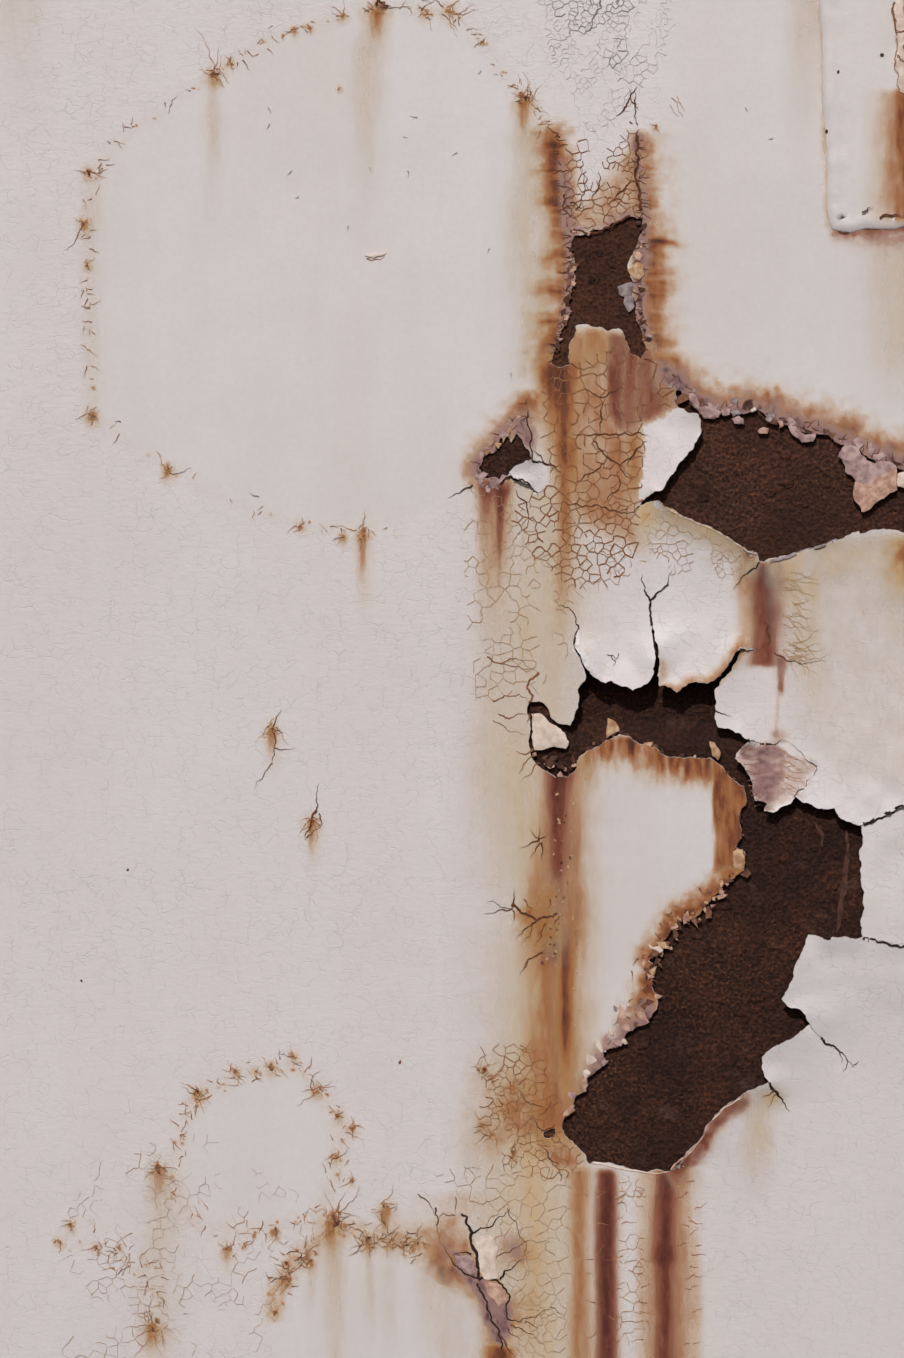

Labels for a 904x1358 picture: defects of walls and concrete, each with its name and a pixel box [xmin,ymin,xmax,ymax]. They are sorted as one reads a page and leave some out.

rust [364,0,477,36]
crack [79,21,313,442]
peeling [547,129,655,370]
rust [332,511,369,567]
peeling [449,411,554,498]
rust [463,74,904,693]
rust [254,711,290,789]
rust [300,786,322,843]
peeling [527,382,904,1255]
rust [470,730,801,1358]
rust [269,1111,424,1315]
crack [439,1040,706,1358]